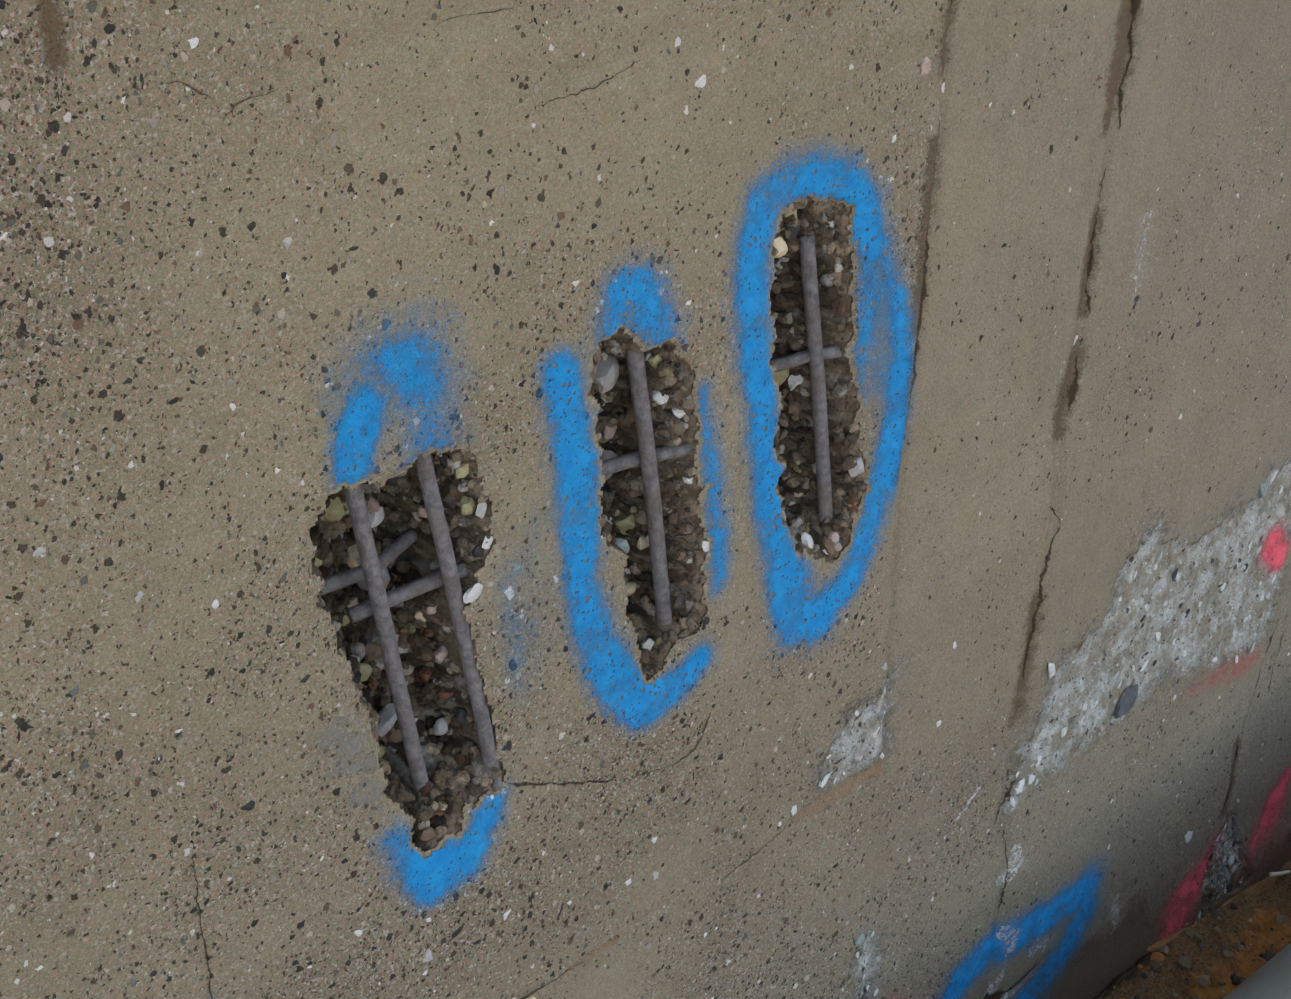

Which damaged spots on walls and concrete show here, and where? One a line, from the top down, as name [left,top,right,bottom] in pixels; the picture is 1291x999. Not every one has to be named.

crack [1118,0,1141,131]
crack [1085,168,1106,314]
spalling [769,196,867,562]
crack [1068,357,1078,411]
spalling [587,327,708,681]
spalling [309,448,506,852]
spalling [810,654,913,793]
crack [1023,507,1061,678]
spalling [1000,459,1291,819]